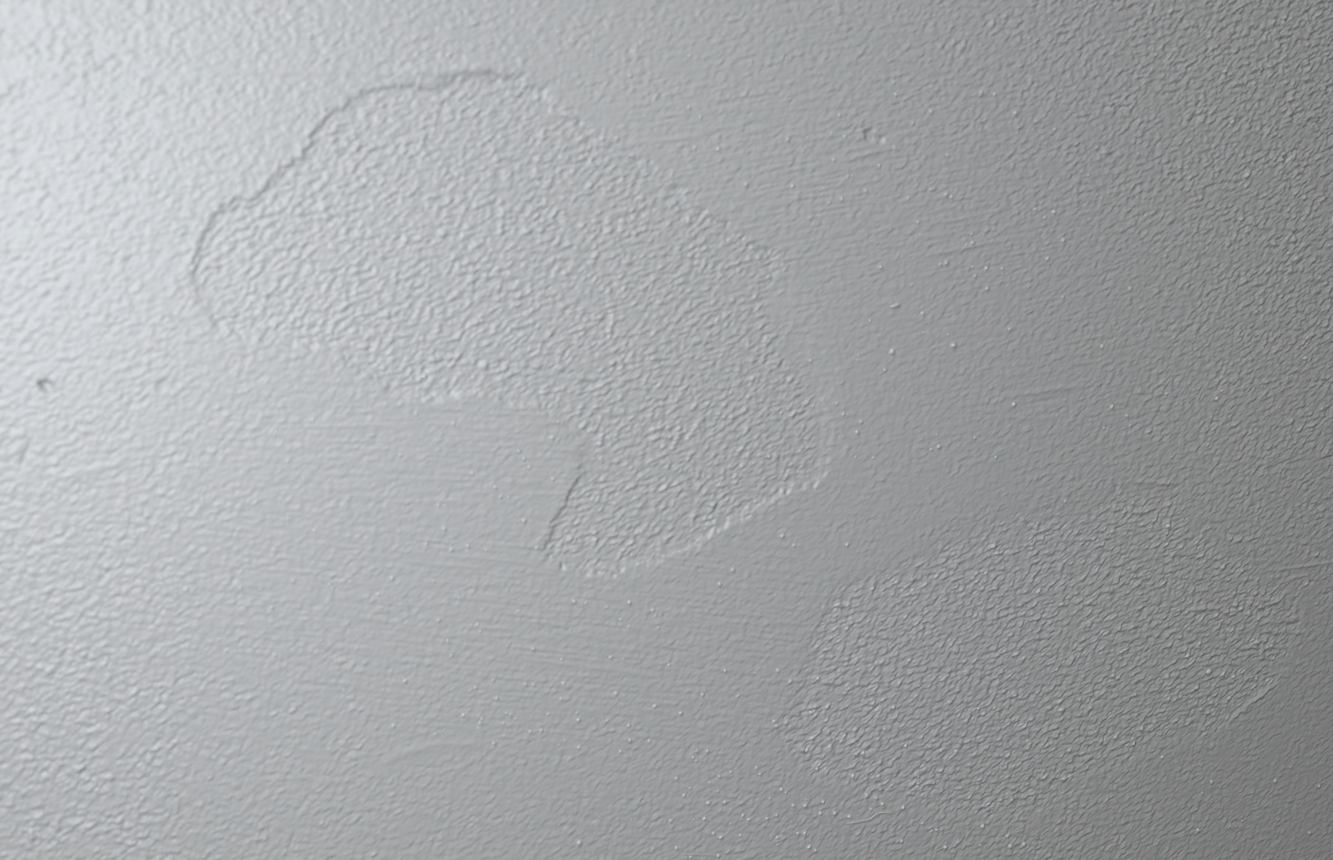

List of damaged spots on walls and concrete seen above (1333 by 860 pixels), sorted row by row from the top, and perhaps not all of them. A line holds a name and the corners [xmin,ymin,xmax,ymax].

peeling [181,64,861,585]